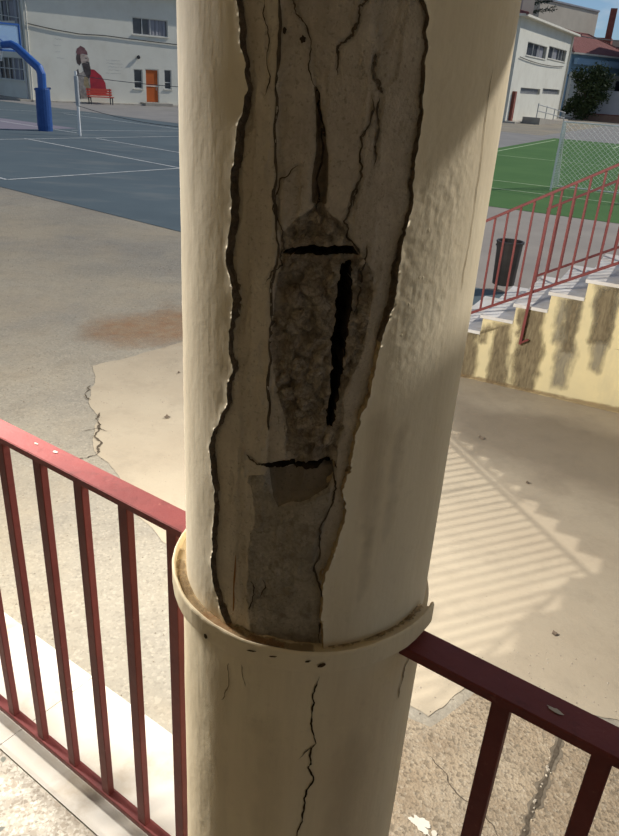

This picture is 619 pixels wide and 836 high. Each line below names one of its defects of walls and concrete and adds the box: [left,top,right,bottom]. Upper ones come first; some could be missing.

spalling [209,0,429,647]
water stain [460,310,544,390]
water stain [553,300,581,387]
water stain [588,286,619,371]
crack [85,385,103,454]
crack [296,679,319,836]
crack [519,736,565,836]